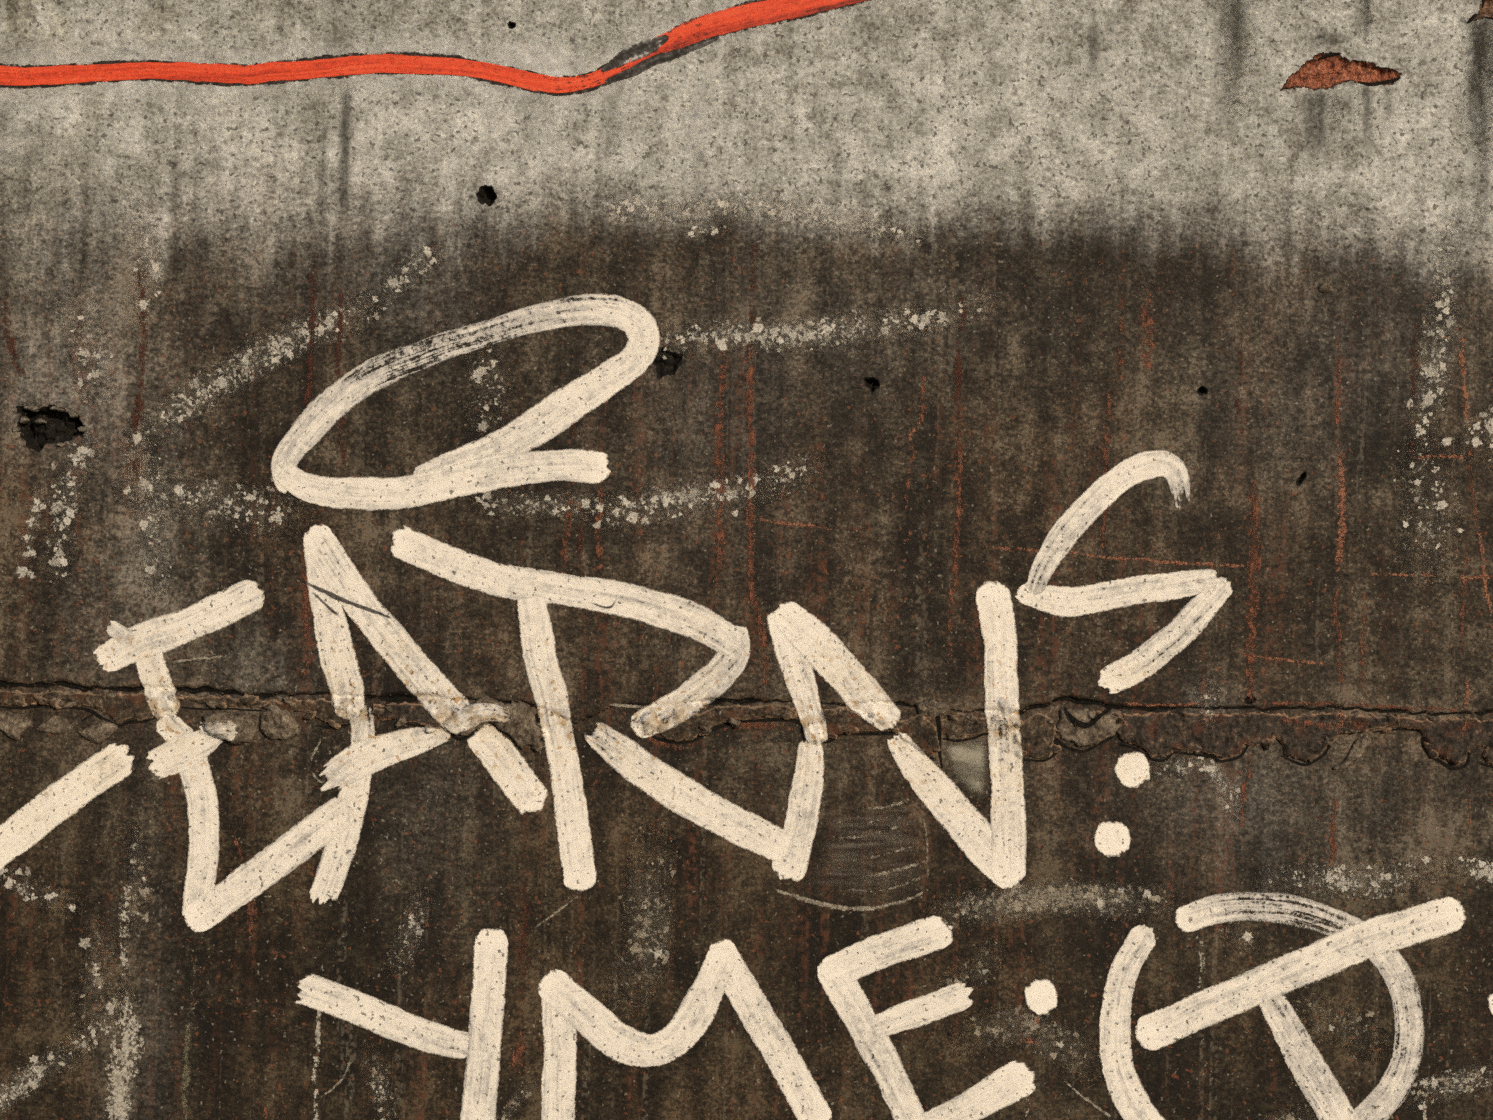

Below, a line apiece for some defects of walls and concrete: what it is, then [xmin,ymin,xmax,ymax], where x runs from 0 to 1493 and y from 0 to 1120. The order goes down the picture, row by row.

crack [0,680,1493,770]